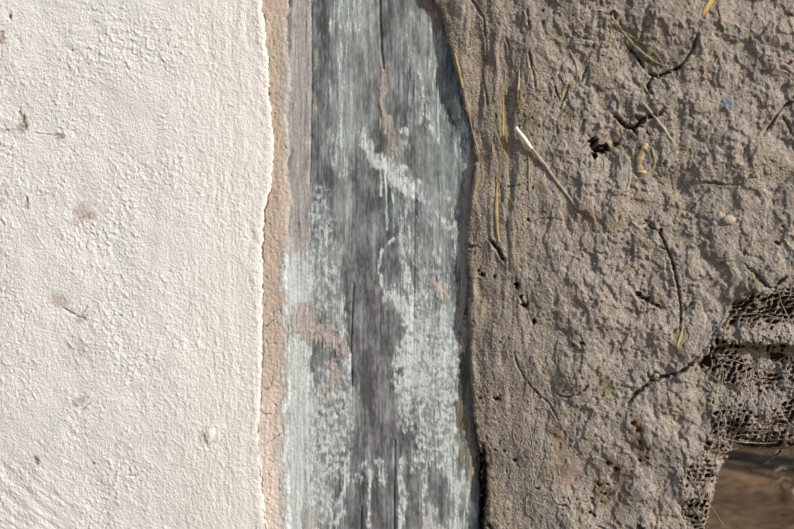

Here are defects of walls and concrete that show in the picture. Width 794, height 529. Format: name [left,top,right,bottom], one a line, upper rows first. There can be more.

peeling [420,0,444,32]
crack [630,41,696,93]
peeling [375,61,403,160]
crack [615,114,653,134]
peeling [429,151,477,353]
crack [647,225,682,337]
peeling [291,294,349,406]
crack [629,362,694,402]
crack [480,444,492,529]